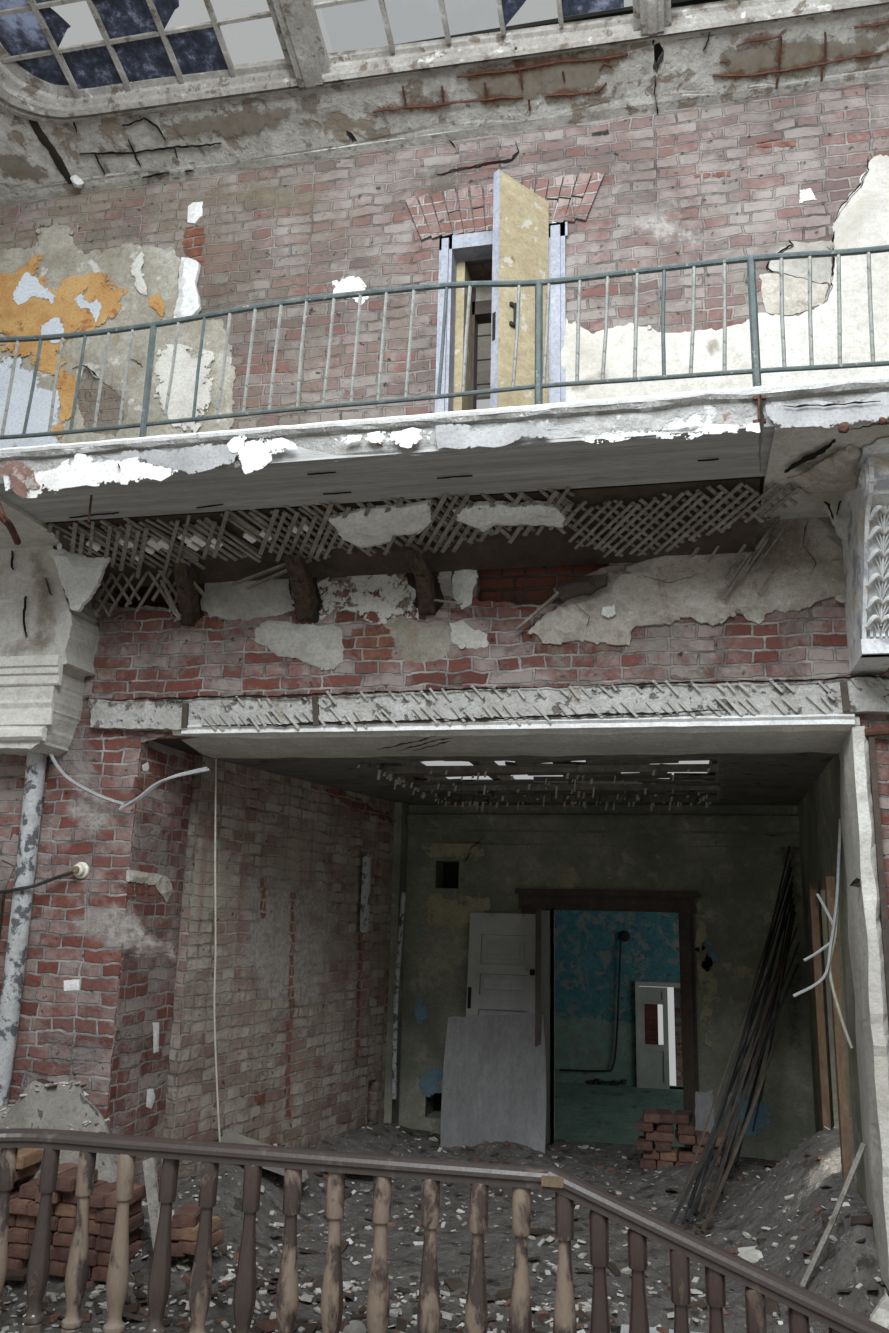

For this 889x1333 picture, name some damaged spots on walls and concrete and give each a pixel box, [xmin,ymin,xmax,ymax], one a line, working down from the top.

crack [14,115,222,184]
crack [437,140,519,176]
spalling [756,138,796,147]
spalling [182,225,205,262]
crack [758,394,889,473]
spalling [89,444,238,475]
spalling [347,624,395,663]